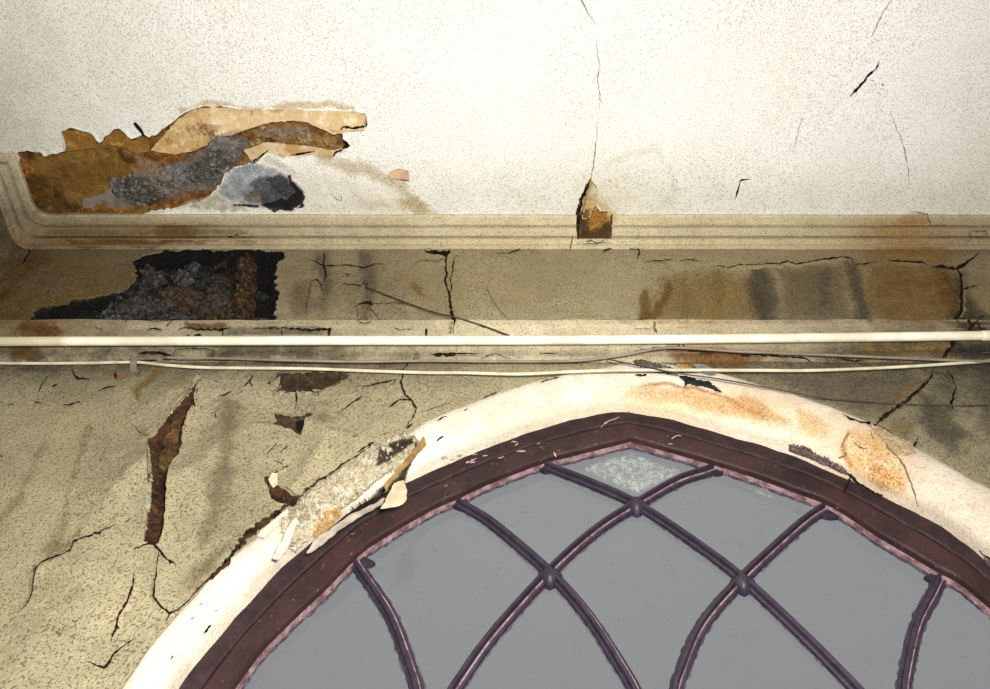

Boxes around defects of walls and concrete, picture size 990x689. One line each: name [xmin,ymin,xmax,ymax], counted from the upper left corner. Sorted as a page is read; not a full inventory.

crack [850,60,884,96]
peeling [15,105,370,214]
spalling [28,248,287,320]
corrosion [640,273,756,320]
damp [783,264,869,319]
crack [116,319,228,362]
spalling [266,370,355,397]
crack [254,253,510,430]
crack [570,230,987,506]
spalling [140,369,207,548]
spalling [257,423,444,560]
corrosion [842,432,904,492]